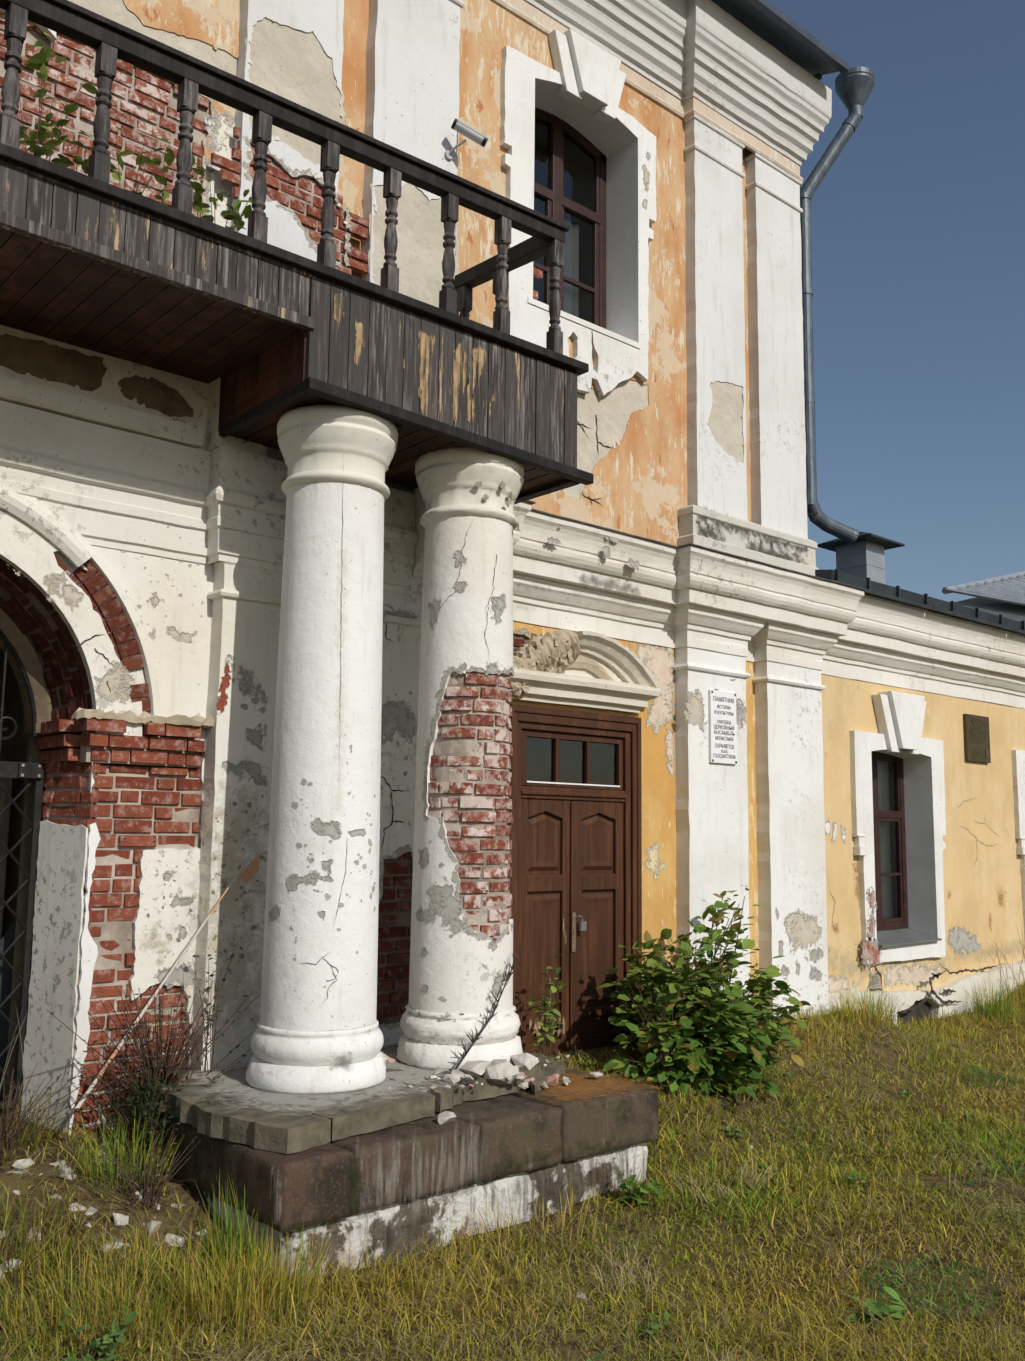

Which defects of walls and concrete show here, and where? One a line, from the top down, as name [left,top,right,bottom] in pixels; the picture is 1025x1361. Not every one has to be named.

flaking render [0,0,459,308]
flaking render [0,329,193,417]
crack [577,415,612,454]
flaking render [563,380,649,499]
flaking render [43,553,204,737]
flaking render [629,642,707,775]
flaking render [208,654,297,964]
flaking render [286,593,531,1032]
flaking render [74,765,235,1141]
crack [301,858,347,1006]
flaking render [776,887,940,1015]
crack [867,964,998,1013]